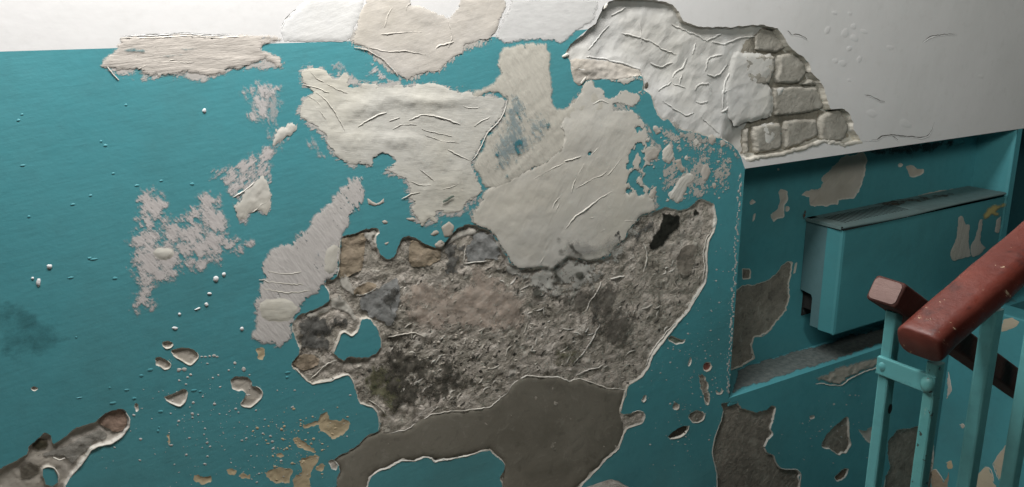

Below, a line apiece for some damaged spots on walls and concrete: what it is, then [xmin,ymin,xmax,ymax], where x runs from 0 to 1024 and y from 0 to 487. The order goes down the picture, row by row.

spalling [562,0,867,207]
crack [862,123,935,142]
peeling [265,199,717,487]
peeling [731,261,797,370]
peeling [0,403,139,487]
peeling [668,357,801,487]